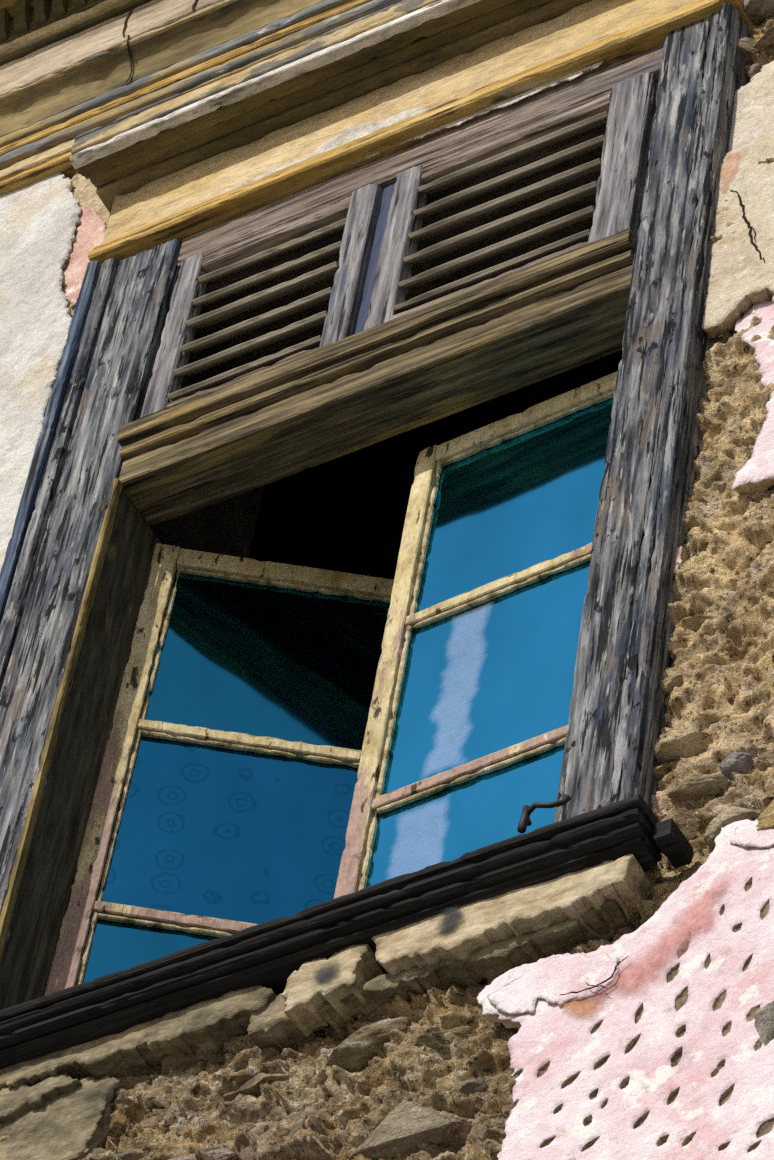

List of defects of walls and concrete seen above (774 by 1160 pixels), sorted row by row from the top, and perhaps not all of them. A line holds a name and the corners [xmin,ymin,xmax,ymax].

crack [122,7,133,83]
spalling [737,0,774,85]
peeling [63,172,111,318]
spalling [710,200,746,243]
crack [730,190,765,263]
peeling [82,300,774,1160]
crack [560,955,629,995]